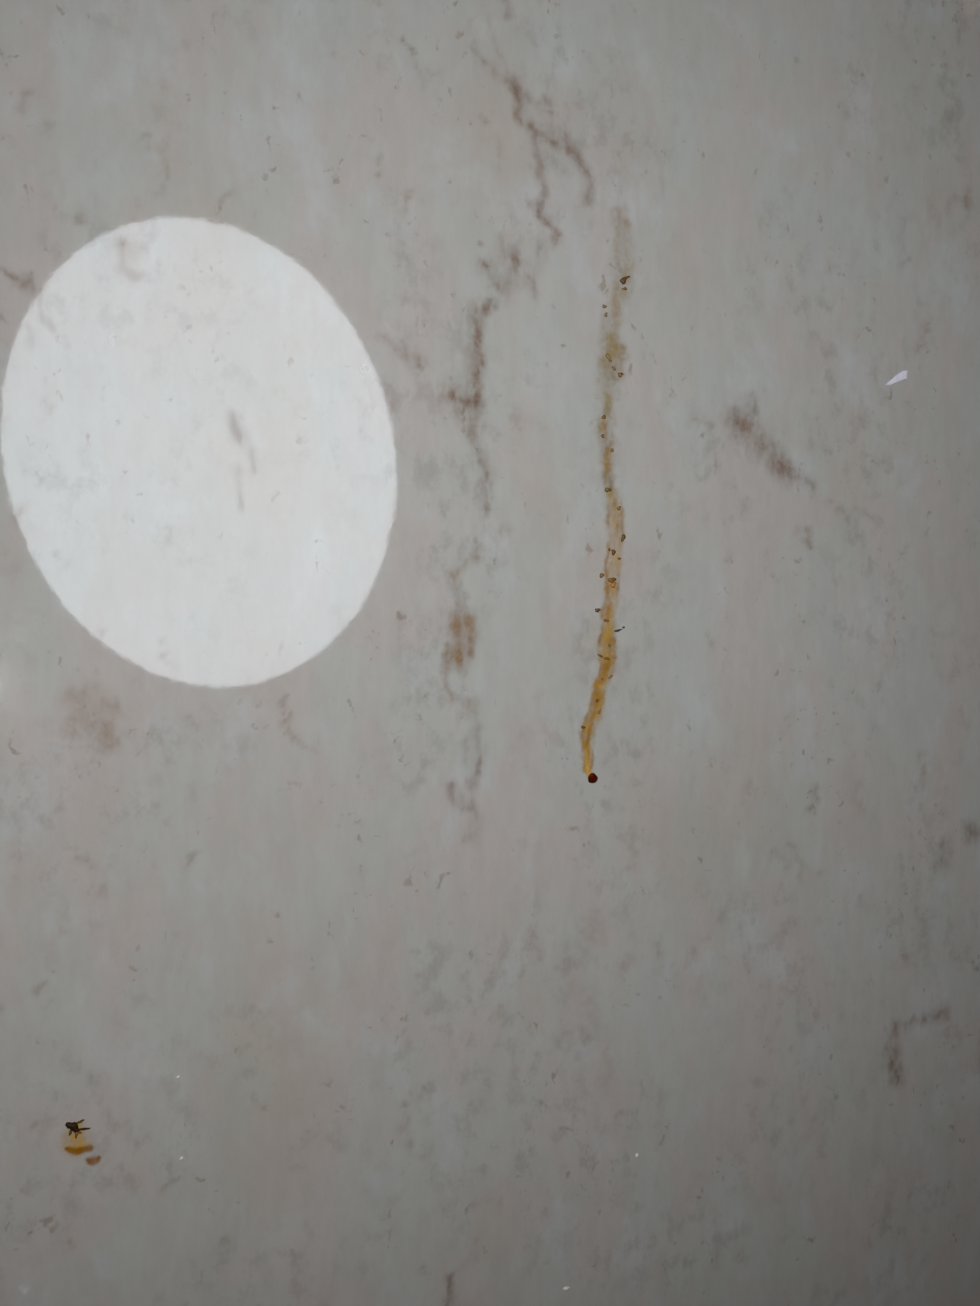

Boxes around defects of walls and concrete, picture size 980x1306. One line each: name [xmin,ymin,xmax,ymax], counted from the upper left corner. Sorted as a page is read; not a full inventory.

corrosion [581,573,625,783]